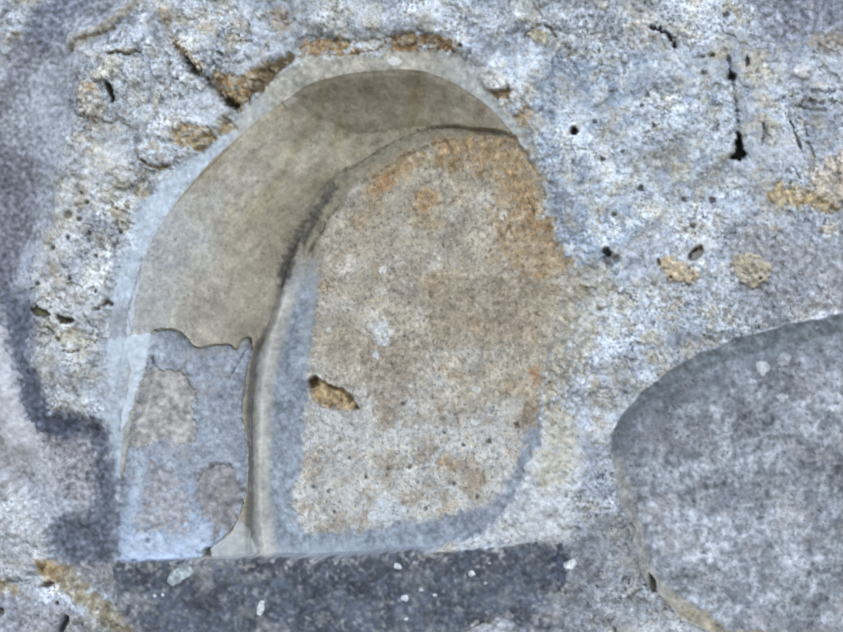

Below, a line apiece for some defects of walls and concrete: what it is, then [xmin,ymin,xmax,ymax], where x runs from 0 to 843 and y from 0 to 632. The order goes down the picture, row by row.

spalling [106,176,257,562]